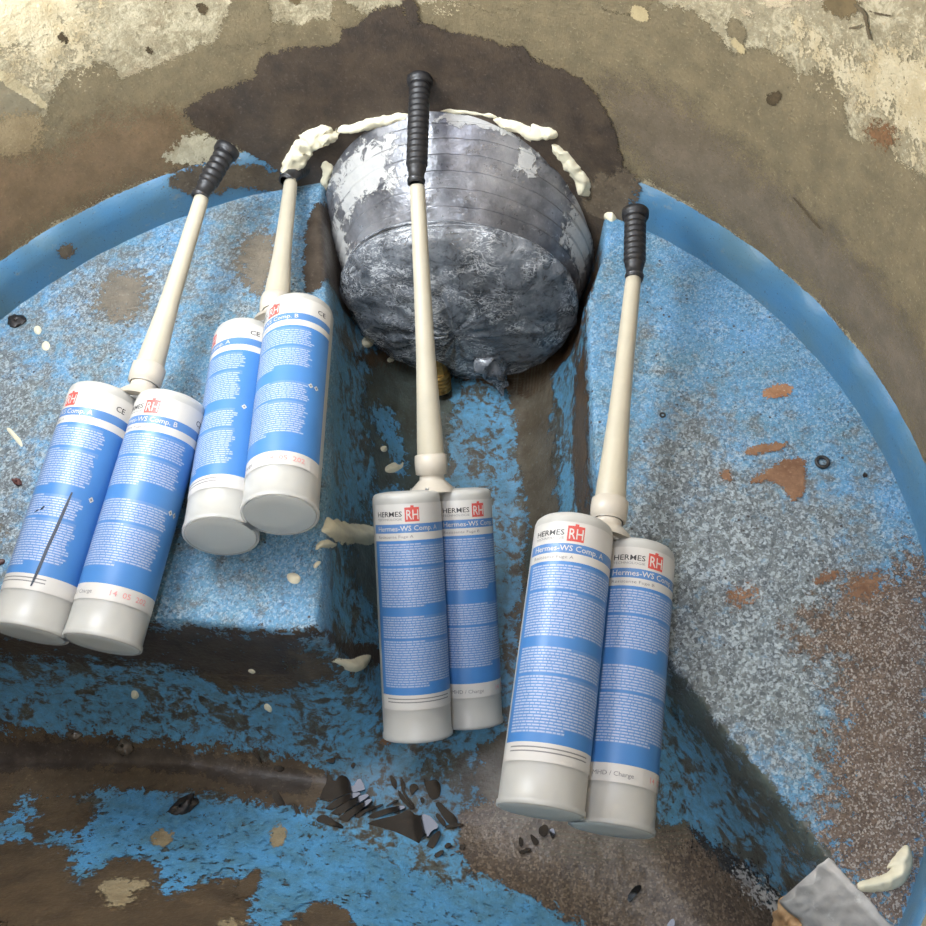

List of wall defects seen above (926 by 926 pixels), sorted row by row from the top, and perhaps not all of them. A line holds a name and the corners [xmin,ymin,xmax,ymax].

leakage [0,0,926,463]
rust [719,469,733,483]
rust [762,383,794,400]
peeling [0,720,357,926]